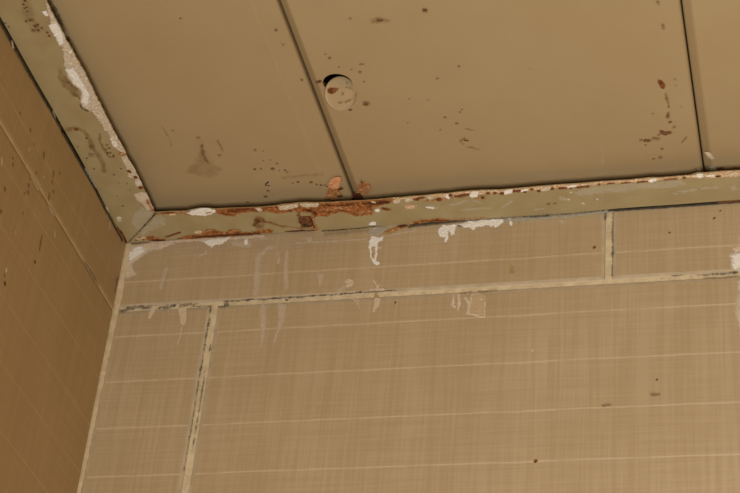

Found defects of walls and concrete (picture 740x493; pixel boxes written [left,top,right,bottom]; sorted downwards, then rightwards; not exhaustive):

rust [136,175,690,242]